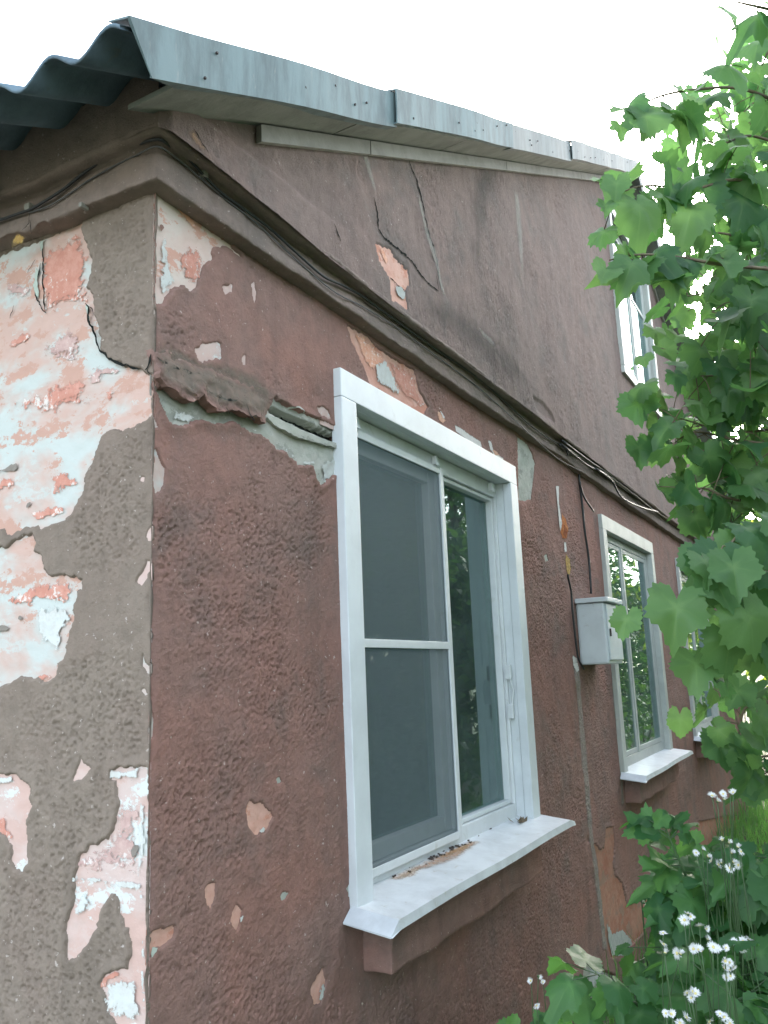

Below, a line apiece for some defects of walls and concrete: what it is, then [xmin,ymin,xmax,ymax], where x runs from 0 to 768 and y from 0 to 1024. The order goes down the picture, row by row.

flaking render [152,194,240,314]
flaking render [375,244,409,310]
crack [374,161,442,291]
crack [85,303,151,374]
flaking render [347,326,427,414]
flaking render [0,224,337,686]
flaking render [0,774,32,872]
flaking render [73,759,91,781]
flaking render [66,766,174,1024]
flaking render [246,801,272,835]
corrosion [392,835,479,878]
flaking render [593,827,647,958]